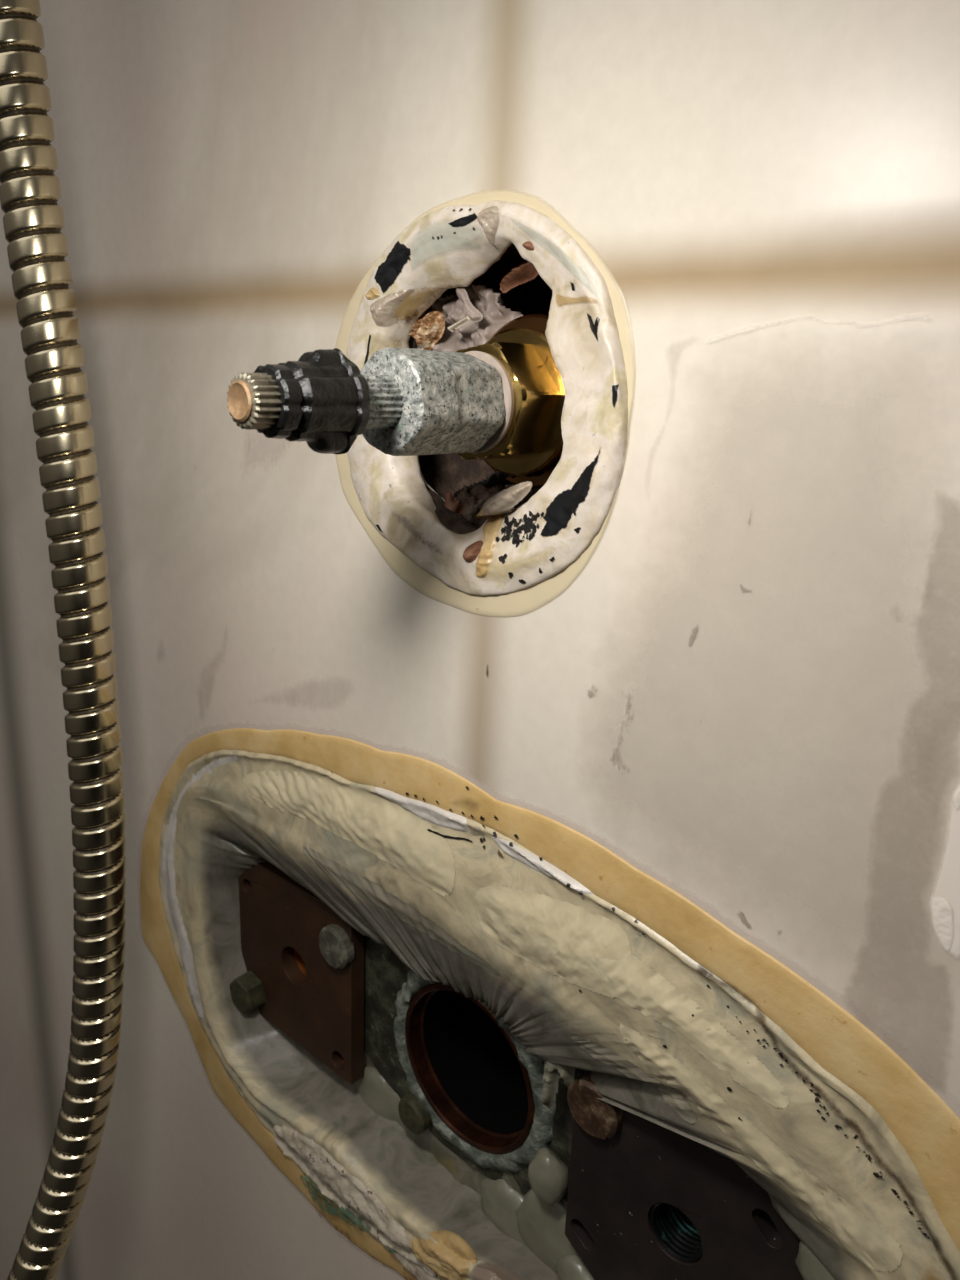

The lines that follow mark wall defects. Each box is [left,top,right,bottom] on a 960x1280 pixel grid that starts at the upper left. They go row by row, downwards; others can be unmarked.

water stain [495,449,600,584]